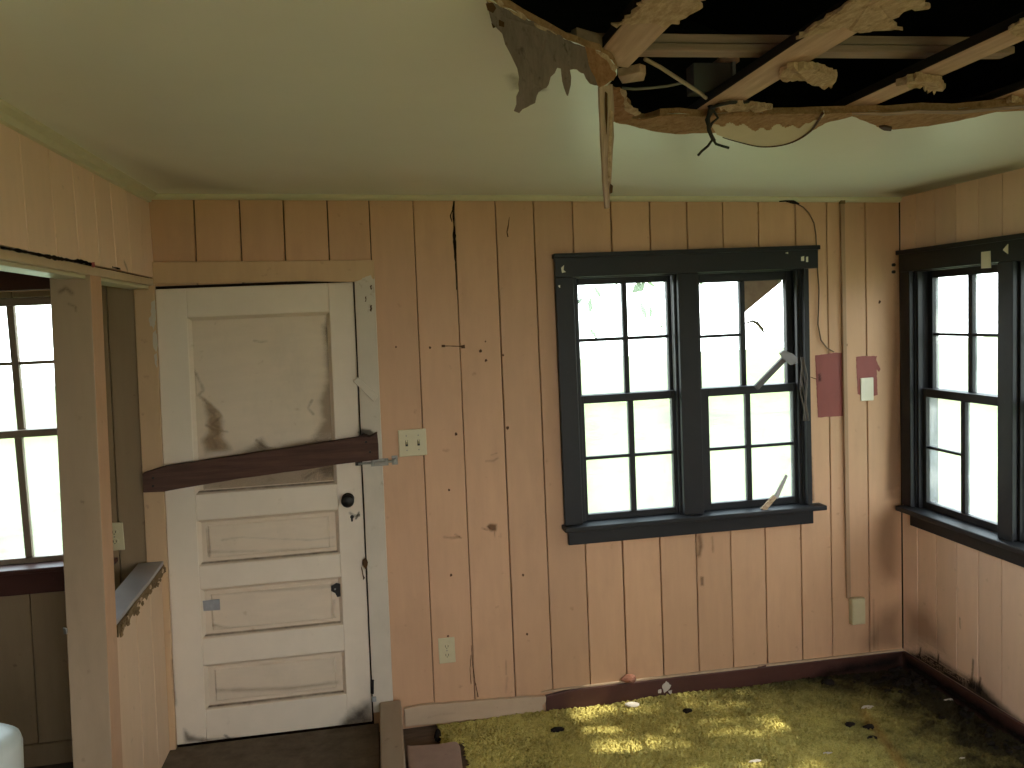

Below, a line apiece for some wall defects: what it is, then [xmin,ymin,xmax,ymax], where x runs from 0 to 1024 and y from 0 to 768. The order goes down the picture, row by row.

peeling [585,46,634,122]
peeling [760,103,1024,131]
crack [449,201,457,290]
damp [911,652,1015,718]